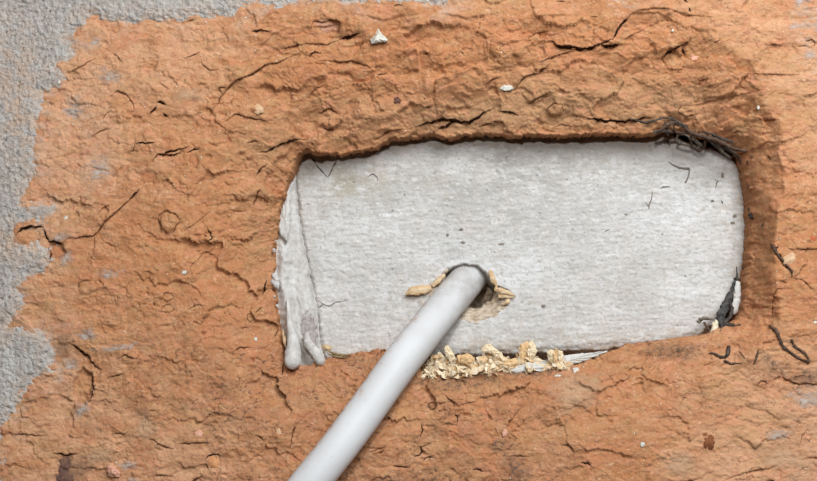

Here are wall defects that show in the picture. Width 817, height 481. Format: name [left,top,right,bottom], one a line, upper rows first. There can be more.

crack [186,19,386,122]
crack [486,0,712,87]
crack [375,91,651,140]
crack [230,108,342,212]
crack [17,190,139,258]
crack [158,210,218,274]
peeling [279,196,291,242]